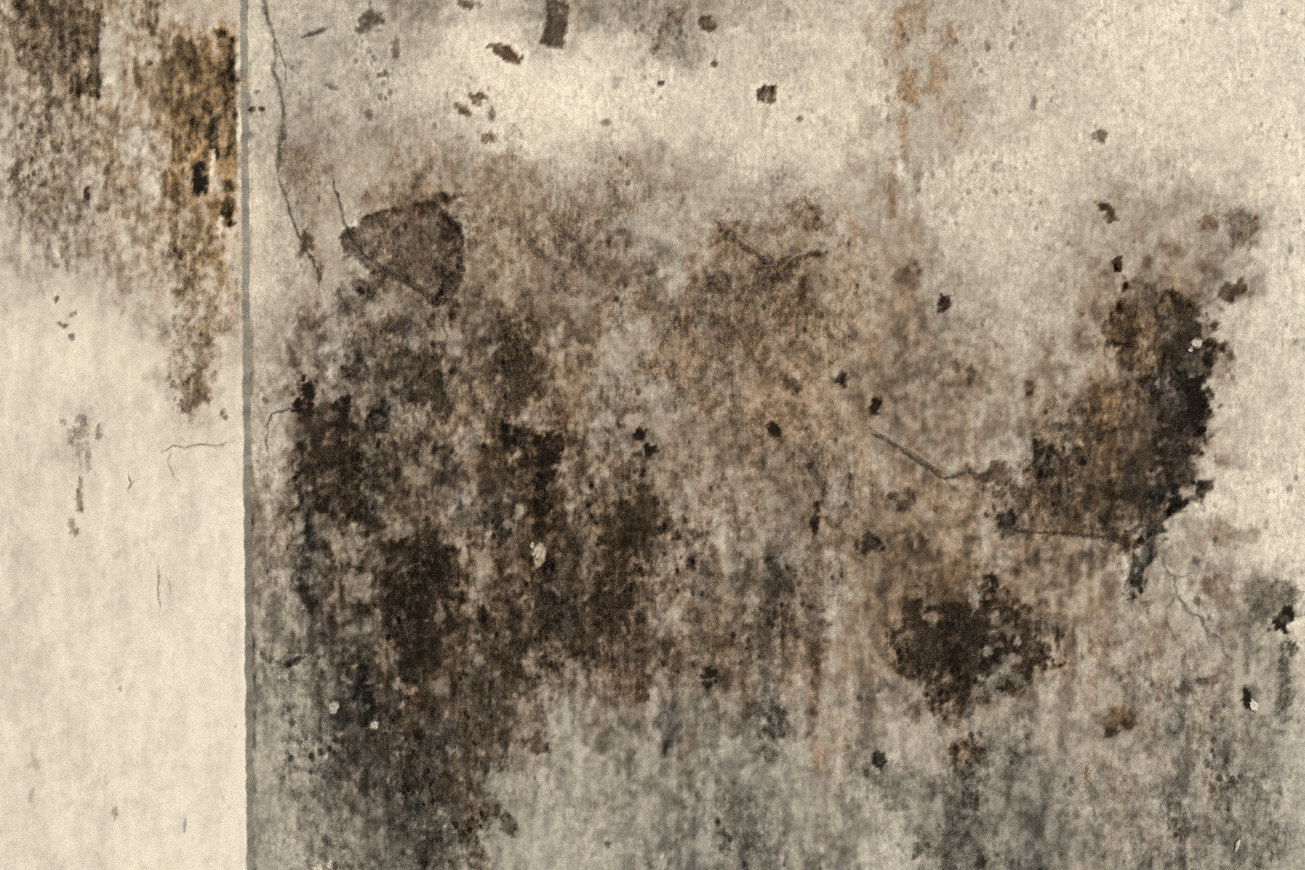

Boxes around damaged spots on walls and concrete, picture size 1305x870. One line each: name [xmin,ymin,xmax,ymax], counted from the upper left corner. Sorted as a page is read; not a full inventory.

water stain [4,0,114,263]
water stain [133,0,265,419]
water stain [937,293,951,313]
water stain [1097,203,1115,218]
water stain [1201,210,1258,248]
water stain [1219,277,1247,303]
water stain [278,166,886,870]
water stain [871,484,916,513]
water stain [984,281,1230,605]
water stain [891,577,1064,717]
water stain [861,732,1067,870]
water stain [1130,678,1279,870]